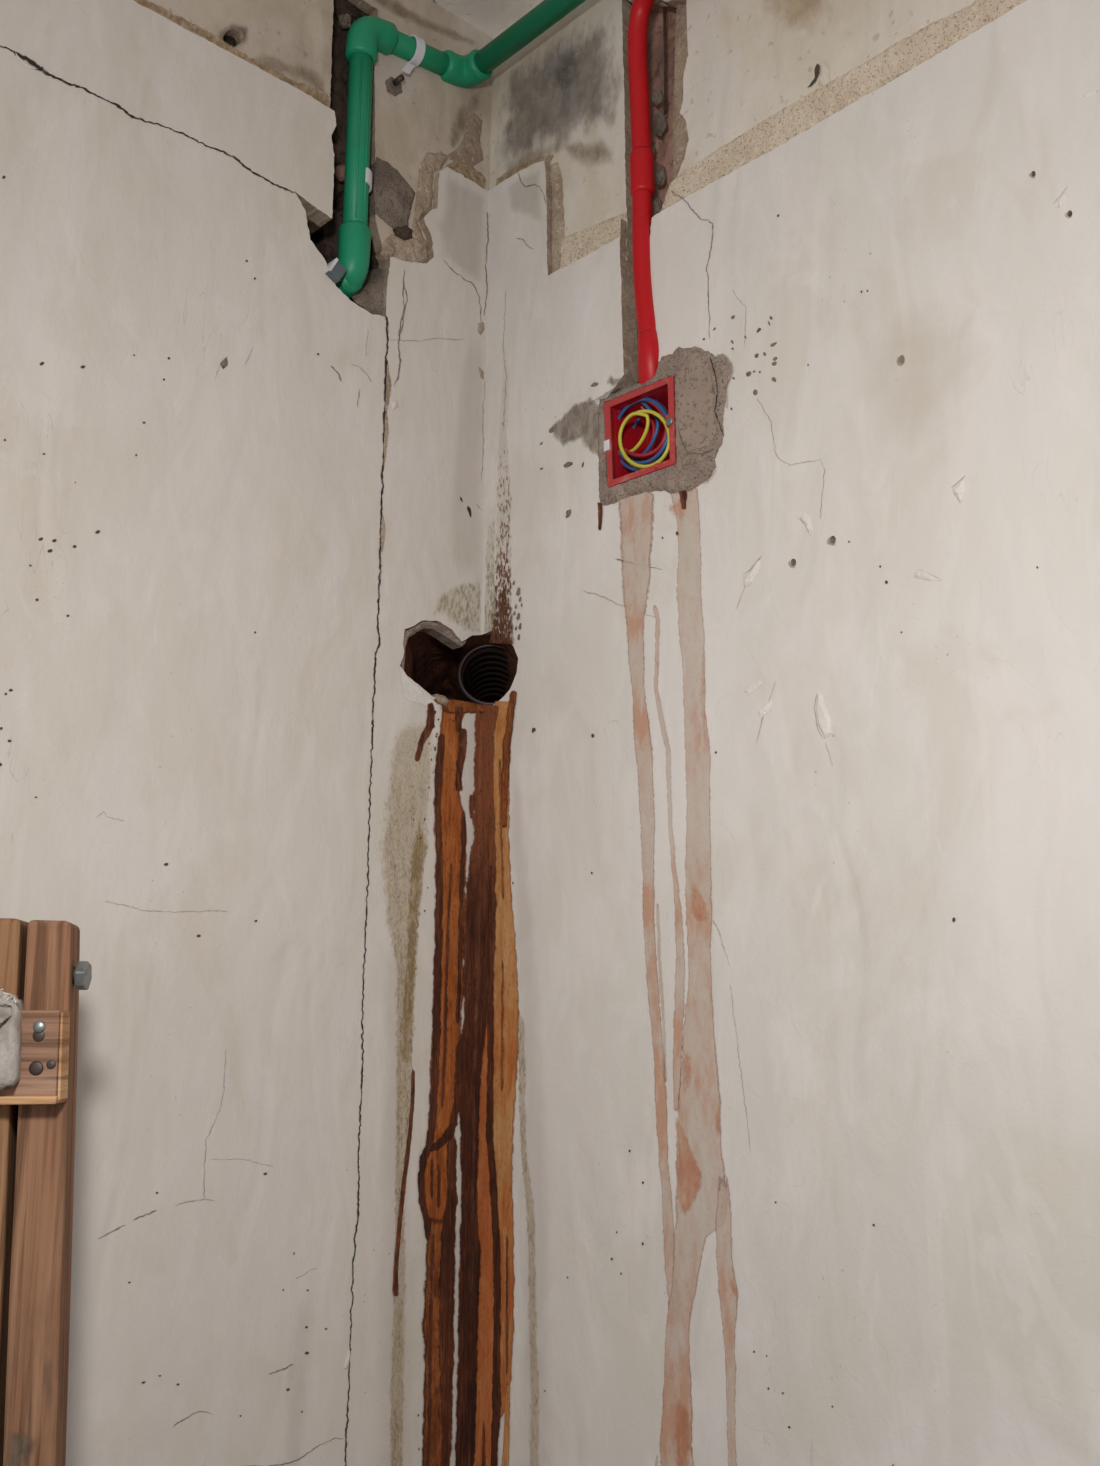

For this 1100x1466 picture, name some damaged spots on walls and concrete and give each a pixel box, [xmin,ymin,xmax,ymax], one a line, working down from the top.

crack [0,46,295,193]
leakage [507,37,603,165]
flaking render [647,0,1027,217]
rust [489,449,522,644]
spalling [400,621,518,706]
crack [254,270,407,1466]
rust [393,691,519,1466]
rust [619,488,738,1466]